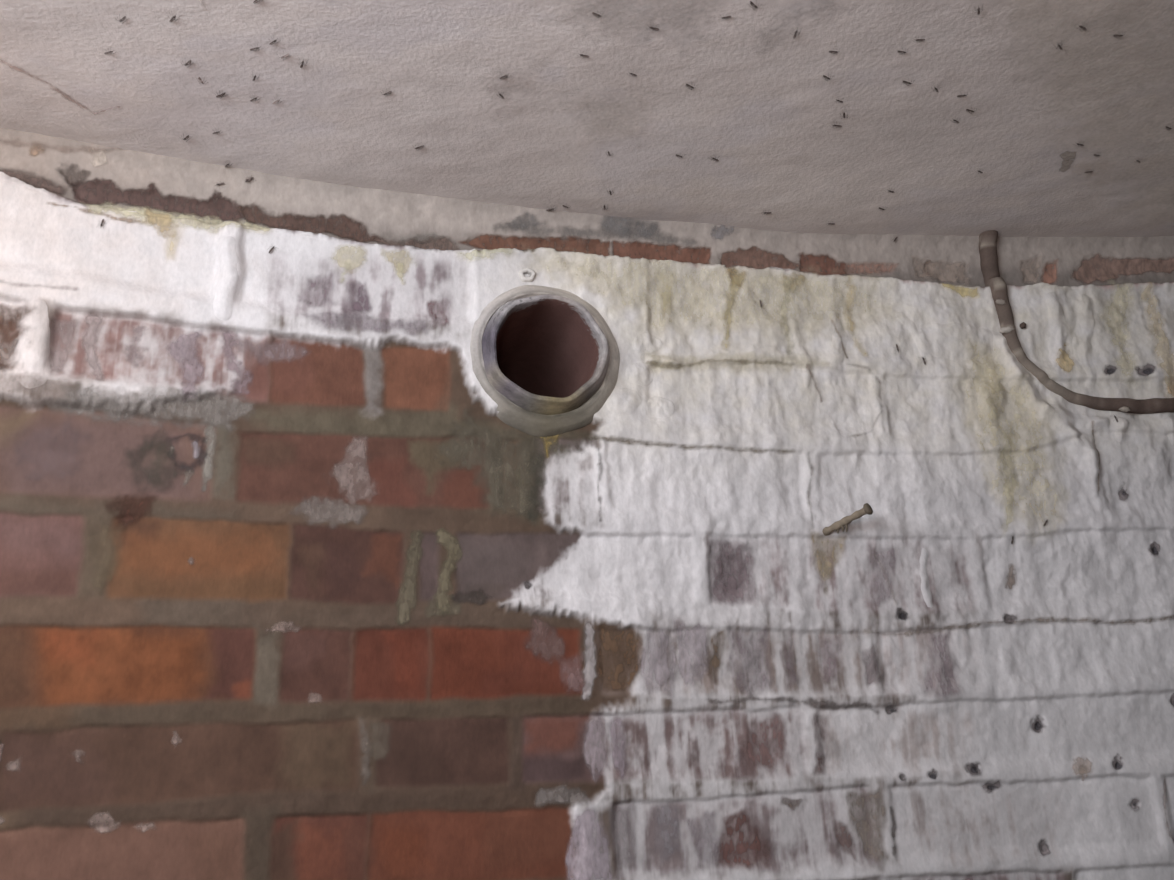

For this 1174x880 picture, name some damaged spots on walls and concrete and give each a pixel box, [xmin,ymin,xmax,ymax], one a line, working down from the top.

crack [1,60,119,112]
spalling [0,148,895,275]
spalling [1073,254,1174,284]
peeling [307,281,447,334]
peeling [0,305,27,369]